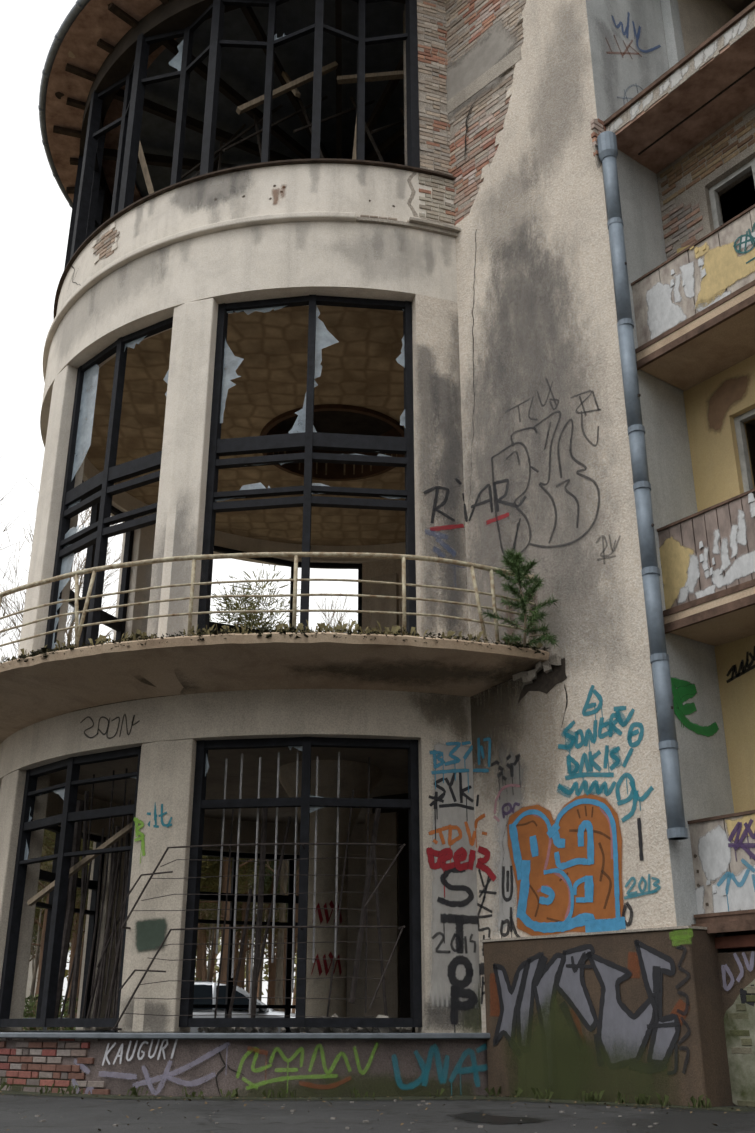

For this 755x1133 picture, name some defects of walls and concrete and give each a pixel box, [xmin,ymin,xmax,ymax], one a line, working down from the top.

spalling [360,0,526,226]
spalling [92,222,120,264]
peeling [646,116,755,340]
peeling [659,493,755,610]
spalling [512,653,567,703]
peeling [694,813,755,914]